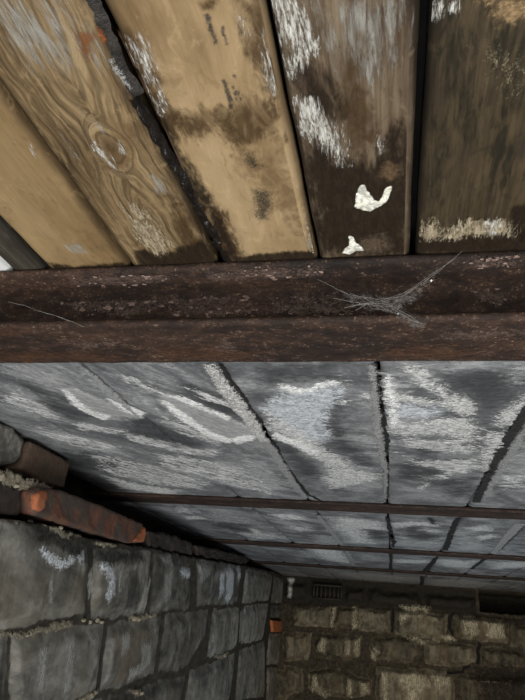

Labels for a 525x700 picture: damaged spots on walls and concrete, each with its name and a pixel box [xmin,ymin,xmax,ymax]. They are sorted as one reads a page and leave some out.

water stain [119,0,407,266]
corrosion [73,273,169,288]
corrosion [60,295,258,318]
corrosion [209,266,323,280]
water stain [417,207,525,254]
corrosion [463,255,520,269]
water stain [1,364,286,495]
crack [219,365,321,501]
water stain [260,365,382,489]
crack [374,364,391,499]
crack [473,406,525,503]
crack [420,518,460,585]